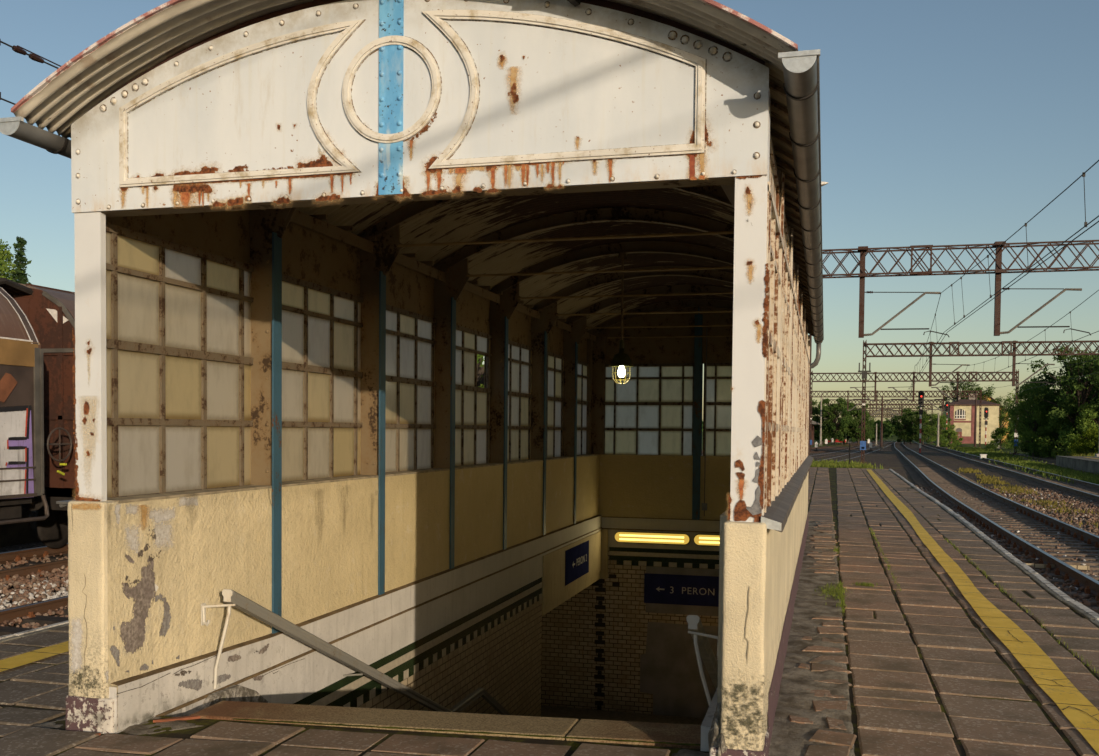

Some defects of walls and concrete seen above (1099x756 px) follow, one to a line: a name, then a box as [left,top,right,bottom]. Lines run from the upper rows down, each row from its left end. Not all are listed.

rust [499,55,525,104]
rust [127,153,353,207]
rust [686,125,712,180]
rust [736,175,762,209]
rust [72,328,100,509]
peeling [734,400,766,522]
flaking render [106,525,171,679]
crack [742,586,750,664]